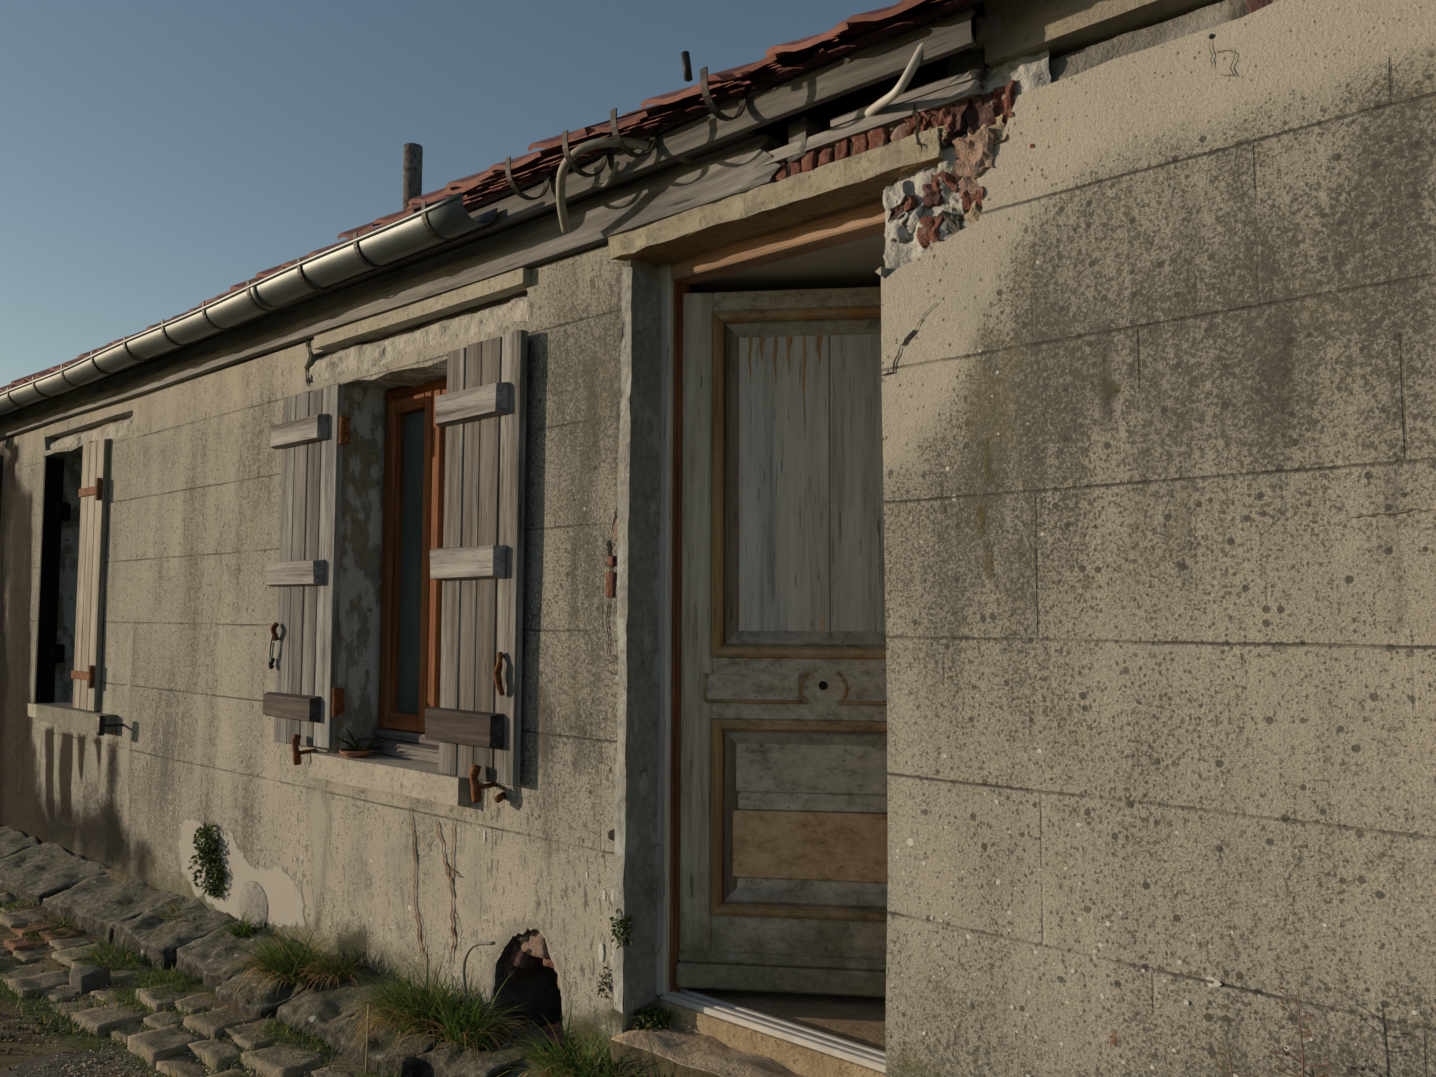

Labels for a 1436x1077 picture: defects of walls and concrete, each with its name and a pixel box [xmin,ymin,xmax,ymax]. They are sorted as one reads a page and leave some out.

flaking render [753,0,1278,275]
water stain [0,440,147,874]
peeling [178,788,330,928]
spalling [462,922,569,1053]